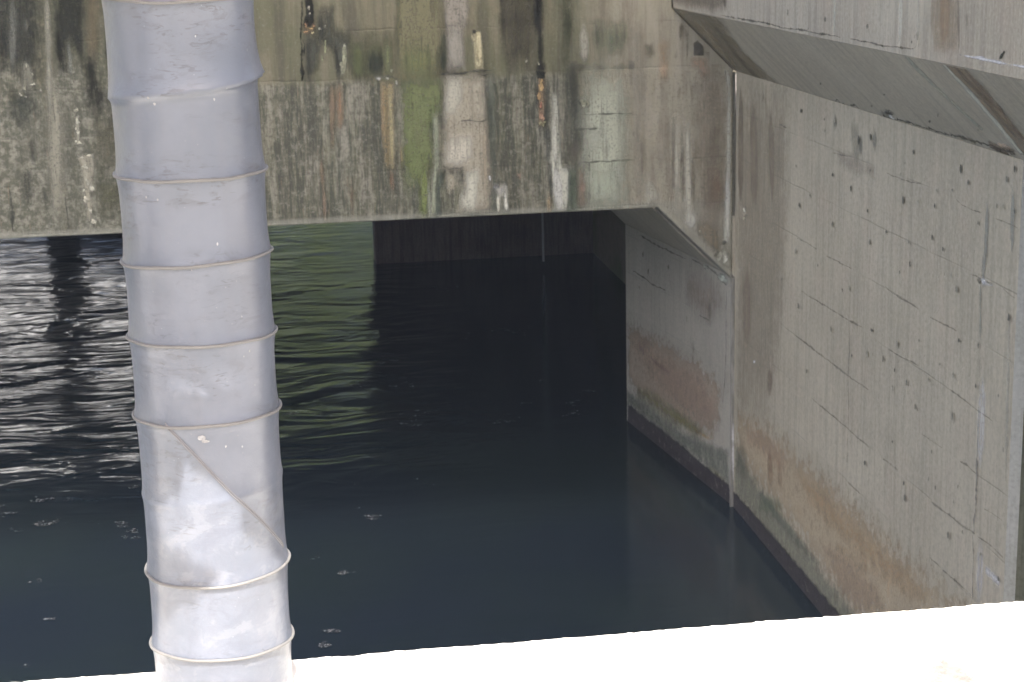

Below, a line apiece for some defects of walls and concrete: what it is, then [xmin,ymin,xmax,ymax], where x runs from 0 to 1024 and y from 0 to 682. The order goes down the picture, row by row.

leakage [0,0,83,228]
leakage [86,64,114,169]
leakage [99,183,119,209]
leakage [421,116,443,214]
leakage [628,405,840,617]